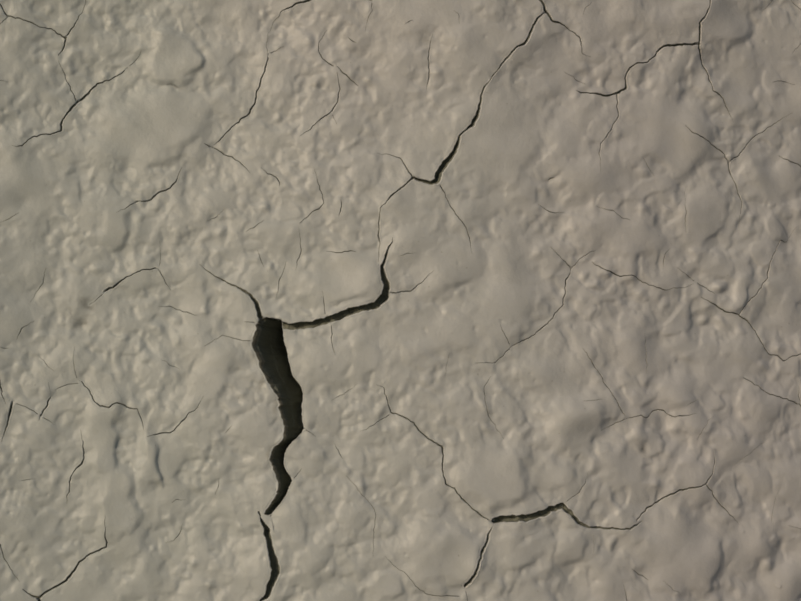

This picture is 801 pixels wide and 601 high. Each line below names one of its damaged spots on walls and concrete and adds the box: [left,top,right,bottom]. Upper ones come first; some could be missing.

crack [0,0,143,149]
crack [562,0,736,174]
crack [114,164,184,215]
crack [684,110,795,230]
crack [0,265,49,351]
crack [87,239,200,318]
crack [197,0,593,601]
crack [473,225,801,442]
crack [0,345,206,445]
crack [64,427,87,507]
crack [358,382,767,601]
crack [0,513,110,601]